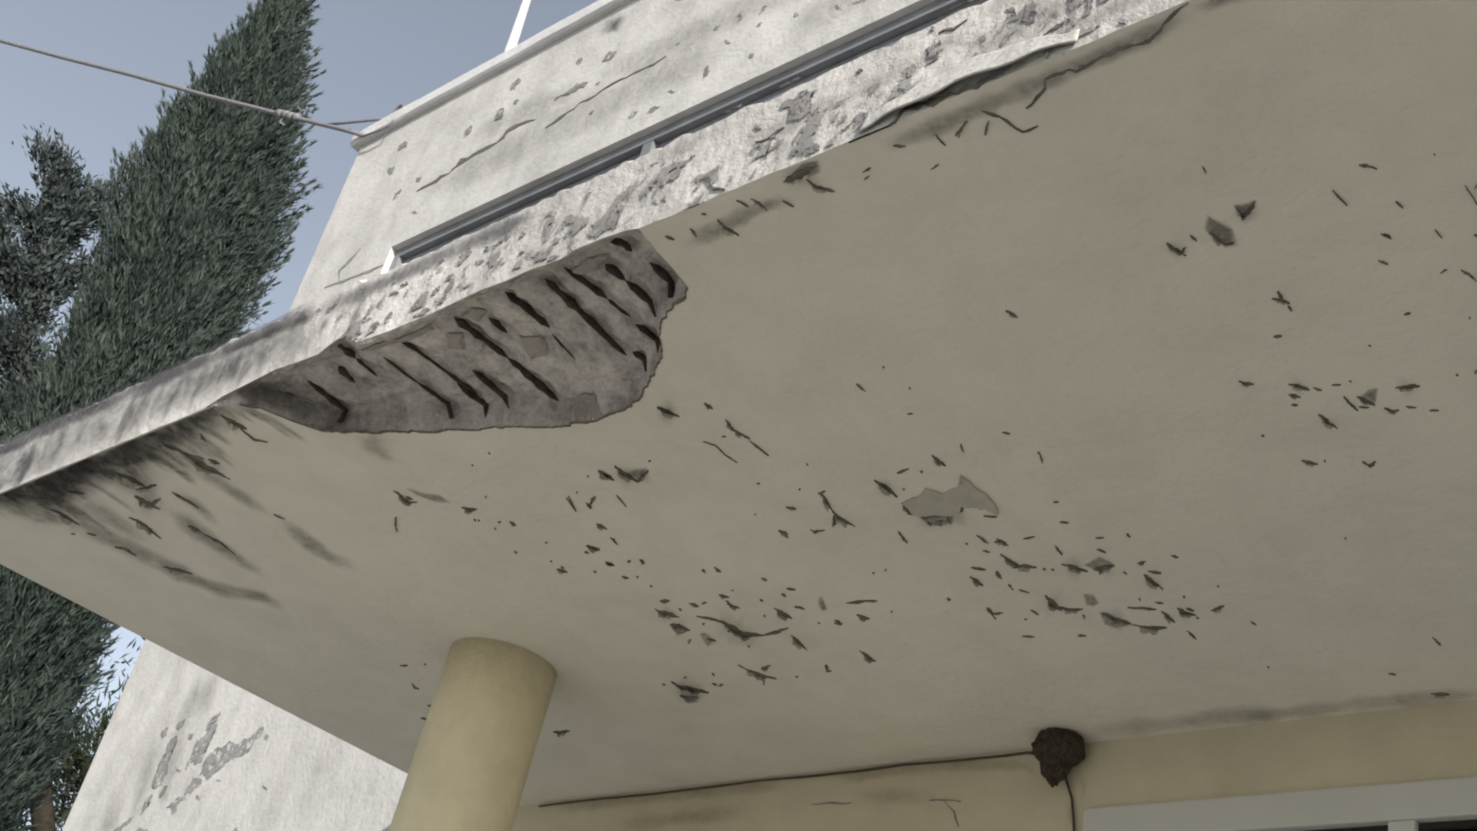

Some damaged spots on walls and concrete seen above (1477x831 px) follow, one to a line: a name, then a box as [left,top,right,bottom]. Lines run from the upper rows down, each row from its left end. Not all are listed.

crack [848,0,1189,143]
peeling [967,0,1129,79]
crack [416,56,666,192]
spalling [207,26,968,443]
peeling [1167,201,1255,257]
peeling [703,402,769,463]
peeling [1288,380,1439,415]
peeling [874,455,998,528]
peeling [566,460,893,650]
peeling [965,535,1224,639]
peeling [662,673,723,703]
peeling [114,711,269,831]